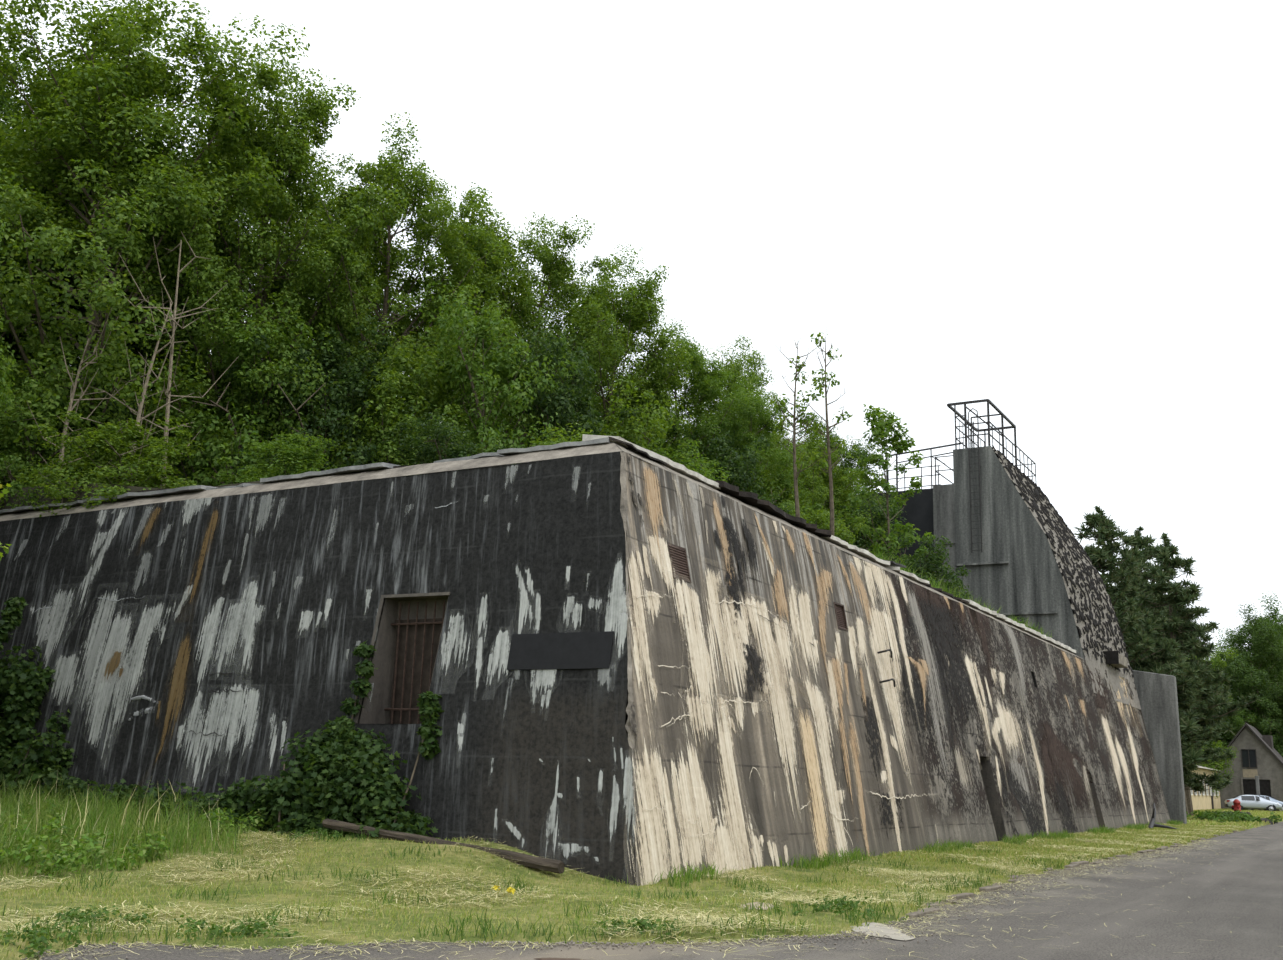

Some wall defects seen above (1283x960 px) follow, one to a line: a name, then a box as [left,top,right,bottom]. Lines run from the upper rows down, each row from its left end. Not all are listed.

peeling [714,495,759,624]
spalling [128,695,155,720]
crack [658,665,692,727]
peeling [743,643,768,704]
crack [750,767,853,845]
peeling [860,696,904,837]
crack [870,791,927,799]